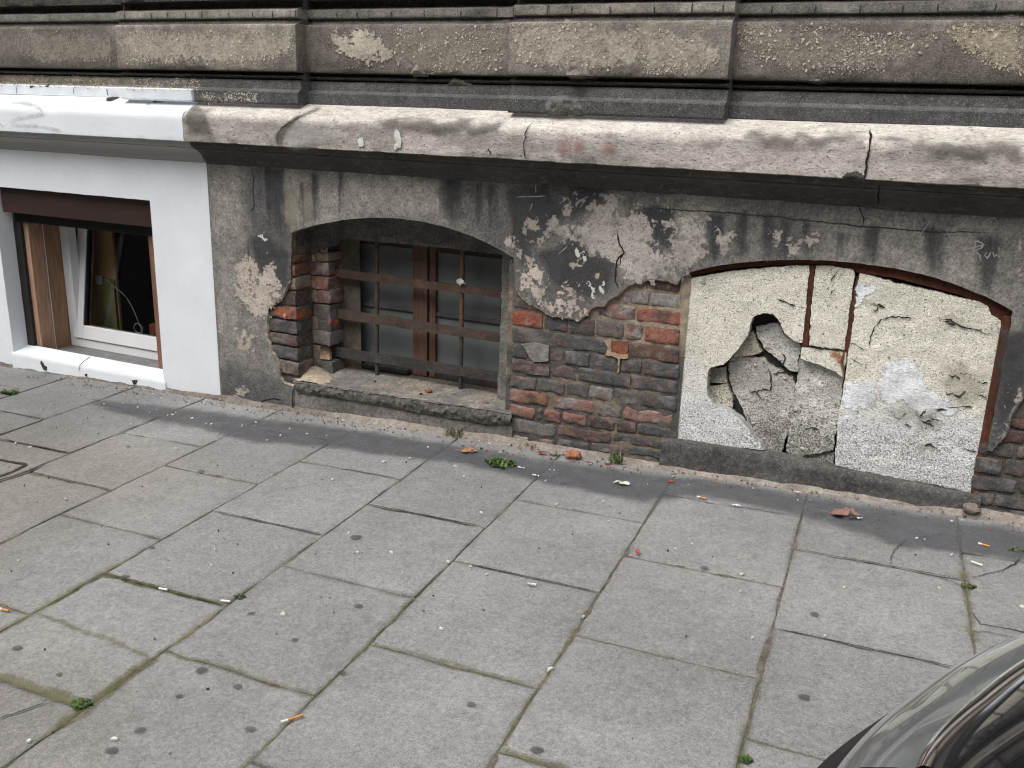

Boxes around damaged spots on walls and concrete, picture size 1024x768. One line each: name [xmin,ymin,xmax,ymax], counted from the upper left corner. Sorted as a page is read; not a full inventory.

peeling [329,19,720,76]
crack [645,129,986,233]
crack [614,230,625,287]
water stain [644,208,673,244]
water stain [708,215,722,258]
water stain [866,228,878,256]
water stain [926,228,941,267]
water stain [979,238,997,288]
spalling [231,190,738,462]
crack [751,316,911,400]
spalling [709,313,847,463]